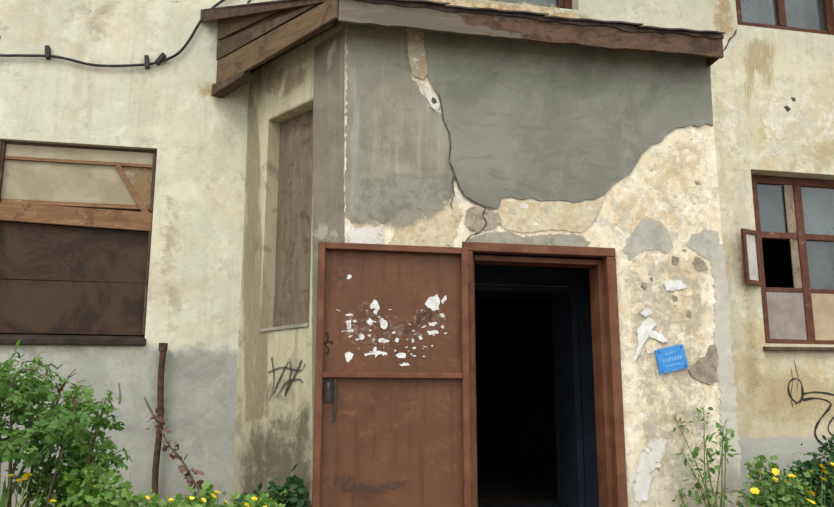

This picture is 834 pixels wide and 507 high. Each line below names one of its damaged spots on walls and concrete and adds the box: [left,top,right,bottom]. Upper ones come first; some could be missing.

crack [429,83,496,242]
flaking render [652,140,674,154]
flaking render [389,196,605,247]
damp [243,98,288,429]
flaking render [664,249,708,271]
flaking render [625,340,661,354]
flaking render [688,344,719,385]
damp [245,408,308,497]